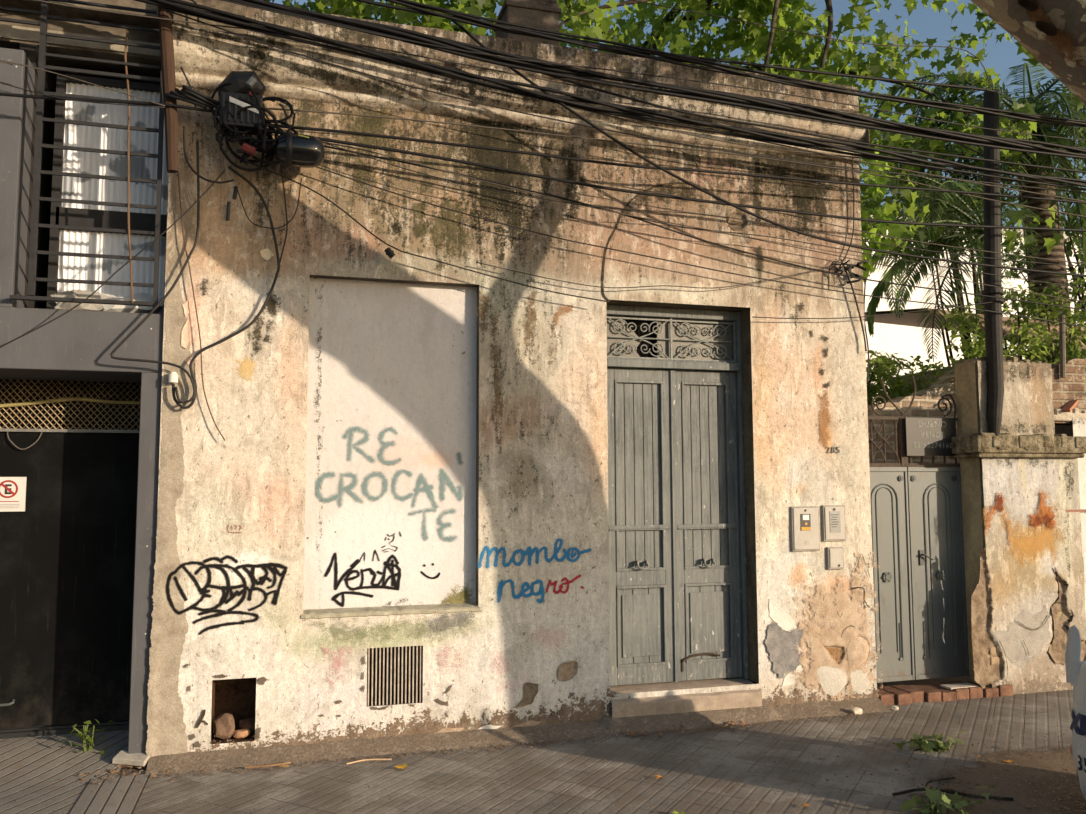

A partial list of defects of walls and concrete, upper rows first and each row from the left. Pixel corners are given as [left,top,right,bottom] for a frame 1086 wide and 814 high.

water stain [243,34,281,77]
mould [344,107,412,201]
water stain [392,117,586,270]
water stain [752,151,847,240]
water stain [754,245,765,290]
rust [818,369,832,447]
peeling [146,272,630,765]
rust [983,488,1063,574]
peeling [760,548,883,706]
flaking render [970,548,1005,688]
flaking render [1048,567,1086,665]